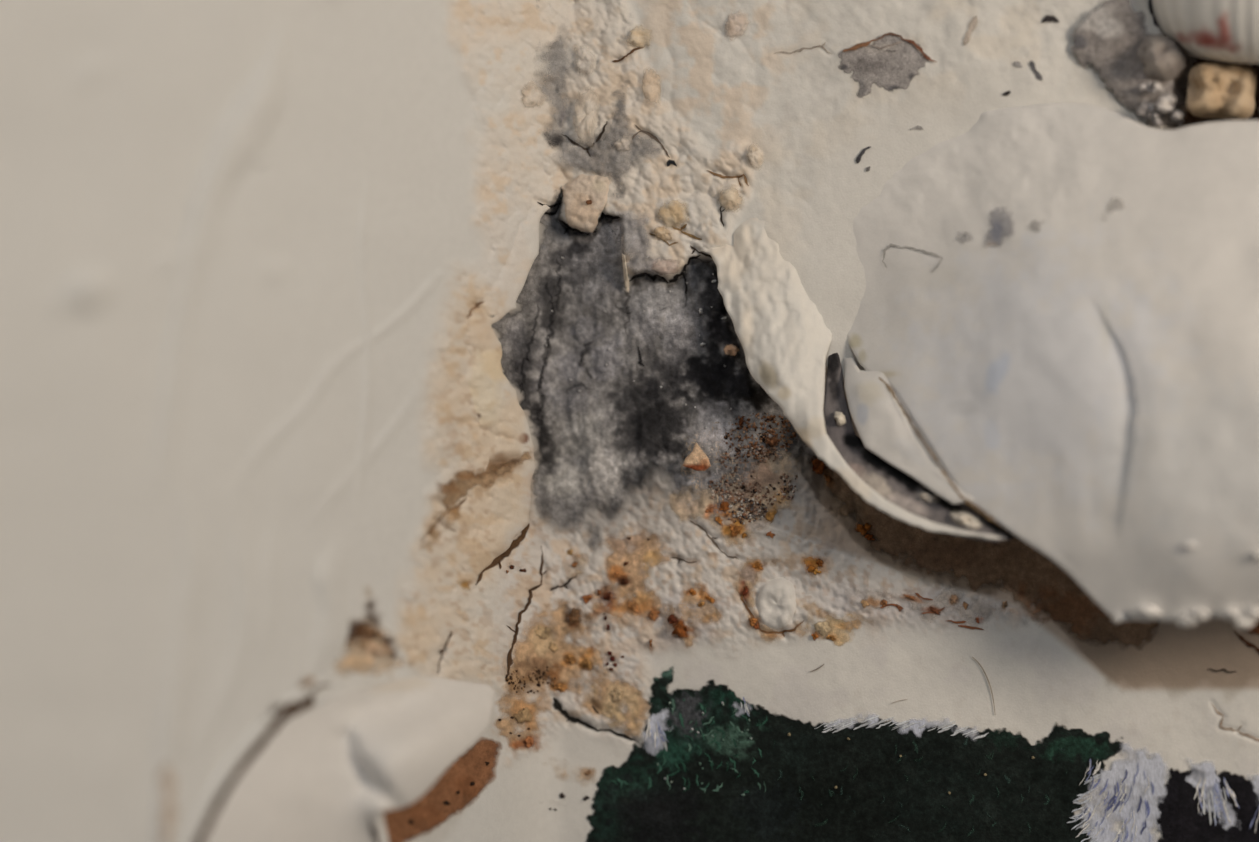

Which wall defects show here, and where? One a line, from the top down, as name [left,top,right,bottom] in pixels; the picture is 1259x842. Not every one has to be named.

spalling [838,32,937,97]
peeling [561,174,610,233]
peeling [466,205,550,571]
water stain [491,196,817,528]
crack [476,524,577,682]
rust [671,413,1159,648]
rust [1234,619,1259,653]